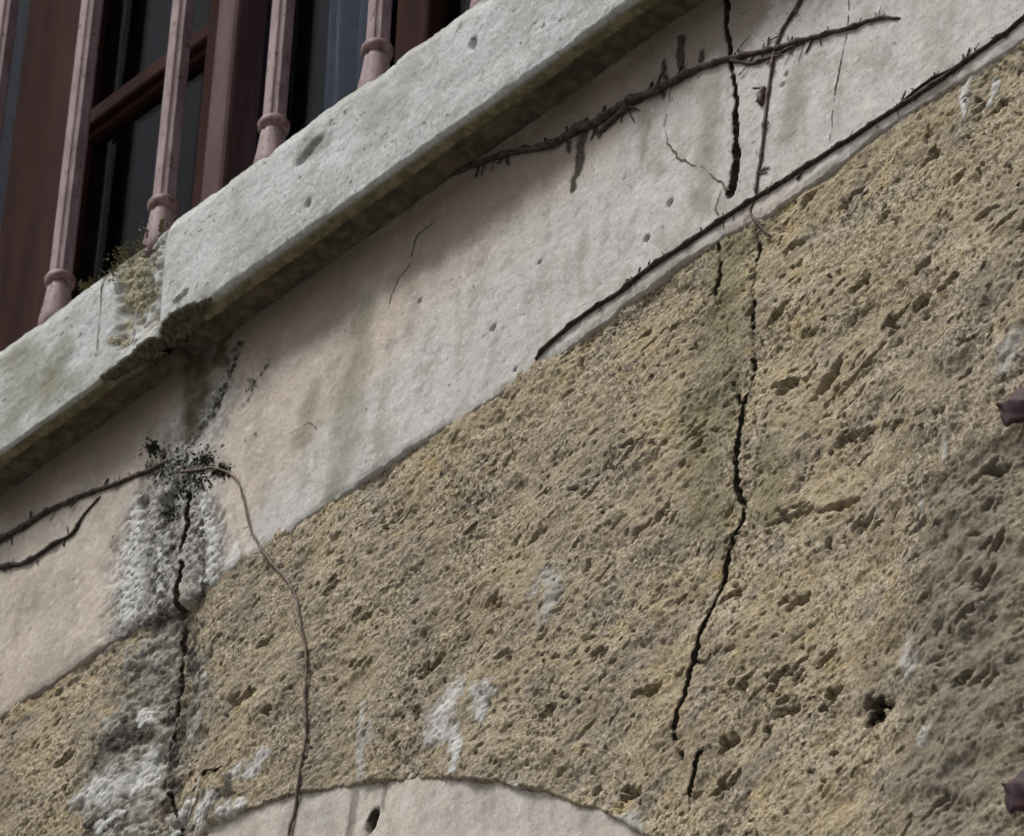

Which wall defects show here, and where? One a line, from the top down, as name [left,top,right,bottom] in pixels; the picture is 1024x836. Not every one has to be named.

crack [663,0,741,215]
leakage [69,492,269,836]
crack [158,492,192,763]
crack [167,792,185,836]
leakage [424,675,496,772]
crack [672,224,763,810]